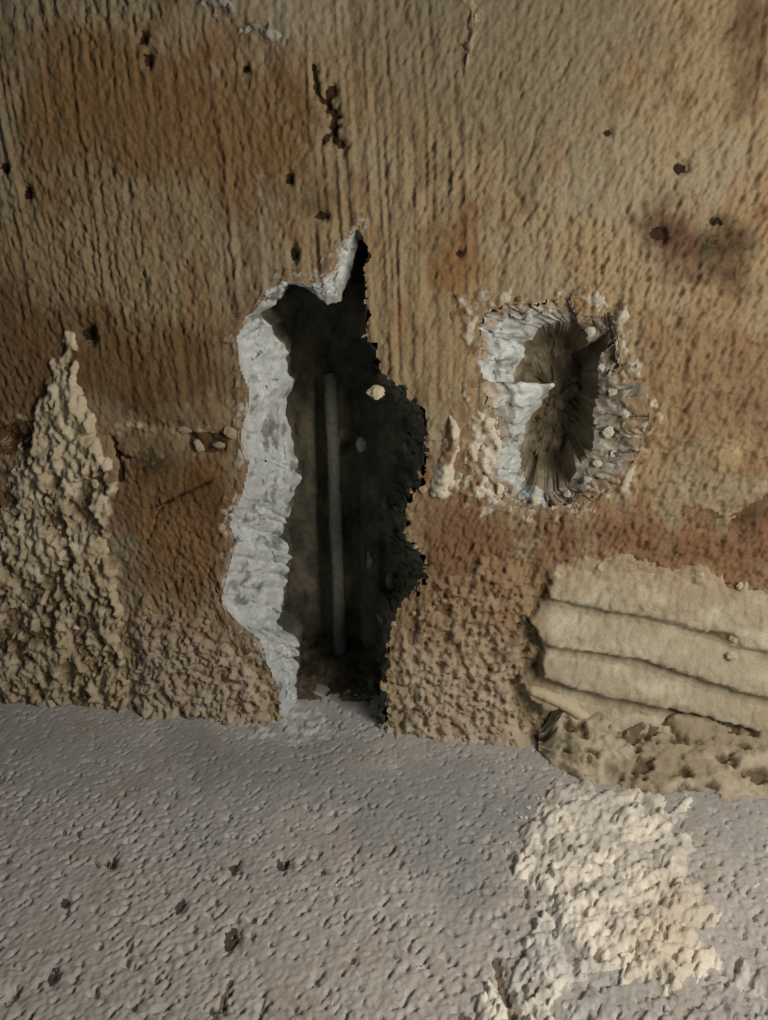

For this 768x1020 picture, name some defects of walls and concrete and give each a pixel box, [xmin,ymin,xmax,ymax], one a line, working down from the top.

spalling [83,325,97,344]
spalling [116,210,663,750]